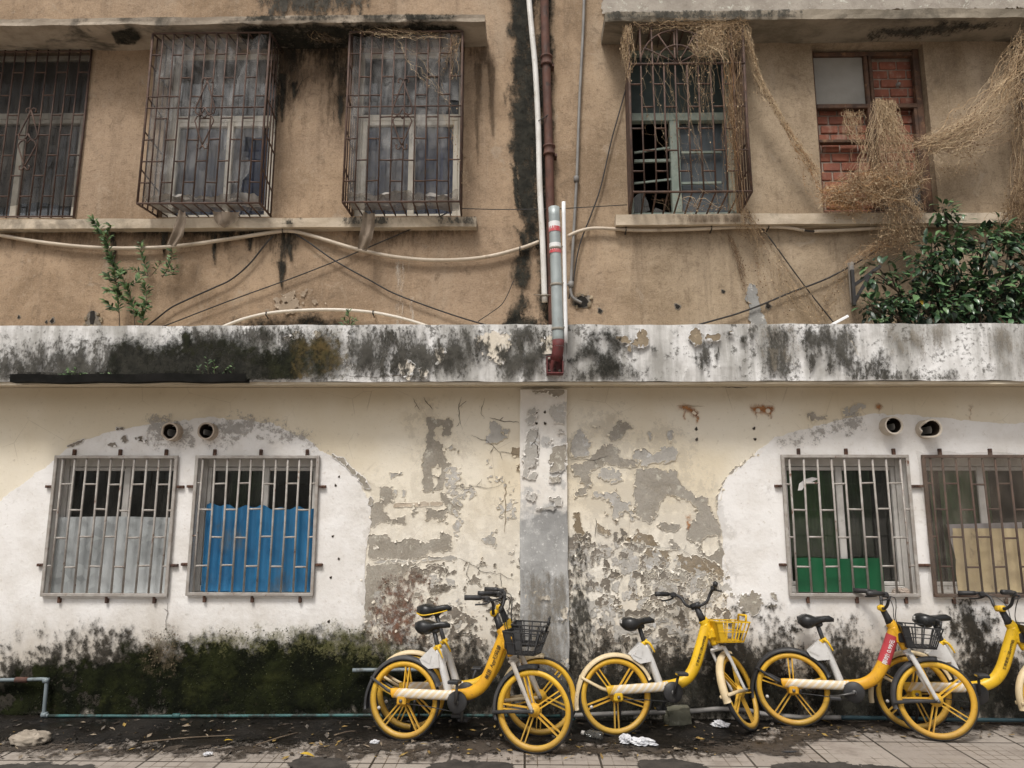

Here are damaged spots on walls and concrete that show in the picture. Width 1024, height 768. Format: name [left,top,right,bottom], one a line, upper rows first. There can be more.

leakage [0,0,556,380]
peeling [474,330,512,365]
peeling [539,335,552,354]
leakage [567,329,649,380]
peeling [615,328,650,352]
leakage [694,341,720,368]
peeling [688,327,734,347]
leakage [726,324,959,380]
peeling [331,416,551,668]
peeling [481,388,778,681]
leakage [440,541,1024,723]
leakage [0,623,143,712]